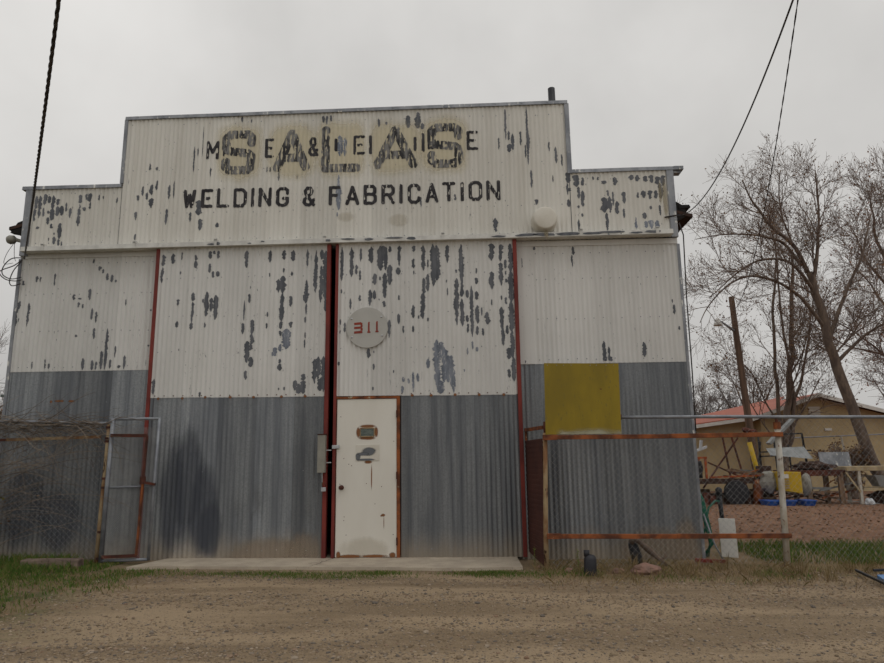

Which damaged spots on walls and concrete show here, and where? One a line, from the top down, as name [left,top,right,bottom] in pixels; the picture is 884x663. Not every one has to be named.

peeling [405,112,424,129]
peeling [498,109,533,188]
peeling [33,193,104,246]
peeling [137,164,175,225]
peeling [194,242,220,278]
peeling [340,142,665,381]
peeling [81,328,126,370]
peeling [175,292,219,330]
peeling [241,294,254,380]
peeling [244,239,331,371]
peeling [278,356,325,394]
peeling [393,340,465,394]